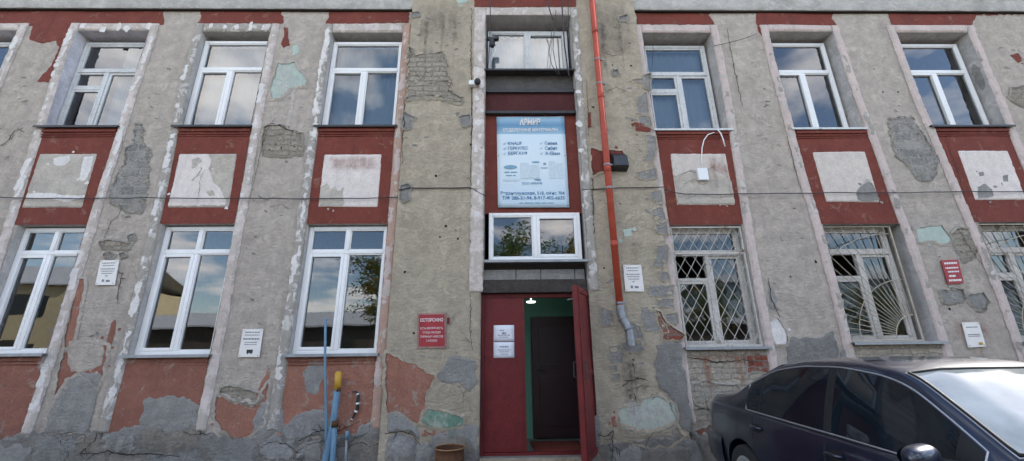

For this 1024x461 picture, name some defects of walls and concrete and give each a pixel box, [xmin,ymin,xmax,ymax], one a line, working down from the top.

peeling [33,23,86,145]
spalling [209,22,330,180]
spalling [388,22,484,223]
spalling [888,91,940,182]
spalling [83,95,244,317]
spalling [912,222,978,264]
spalling [938,285,991,314]
crack [56,431,210,460]
peeling [202,326,283,439]
crack [260,421,420,453]
peeling [374,332,467,436]
peeling [608,282,791,450]